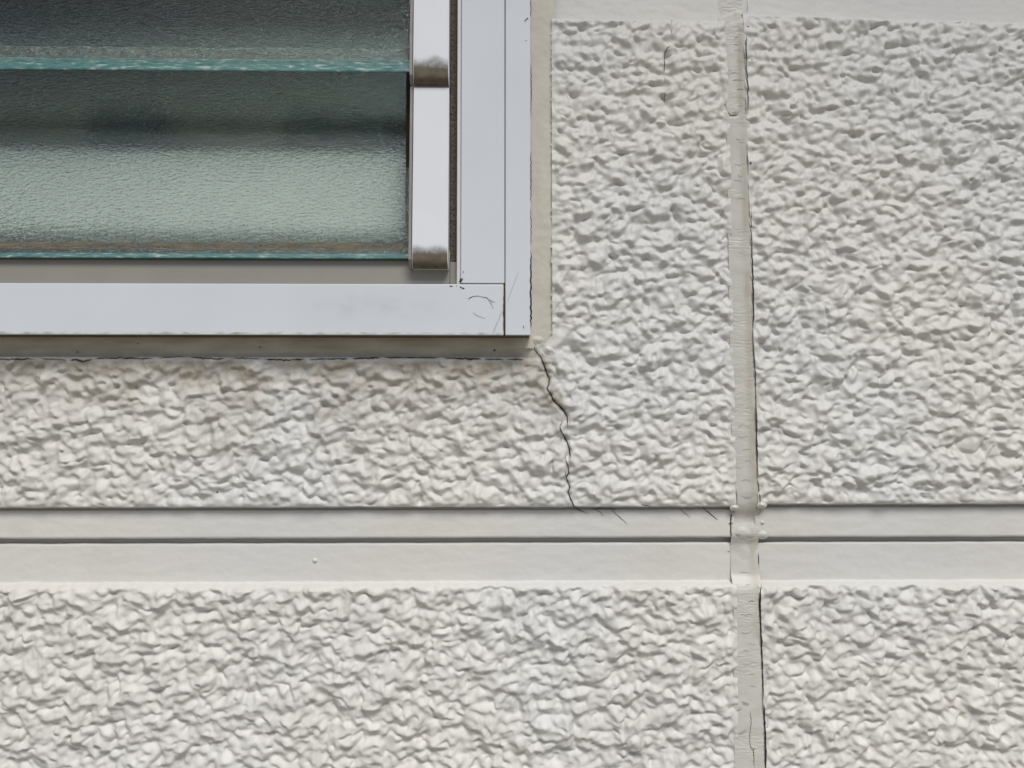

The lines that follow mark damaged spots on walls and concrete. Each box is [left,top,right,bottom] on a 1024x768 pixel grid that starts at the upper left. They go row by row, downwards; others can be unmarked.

crack [0,156,650,523]
crack [728,6,754,324]
crack [679,356,767,767]